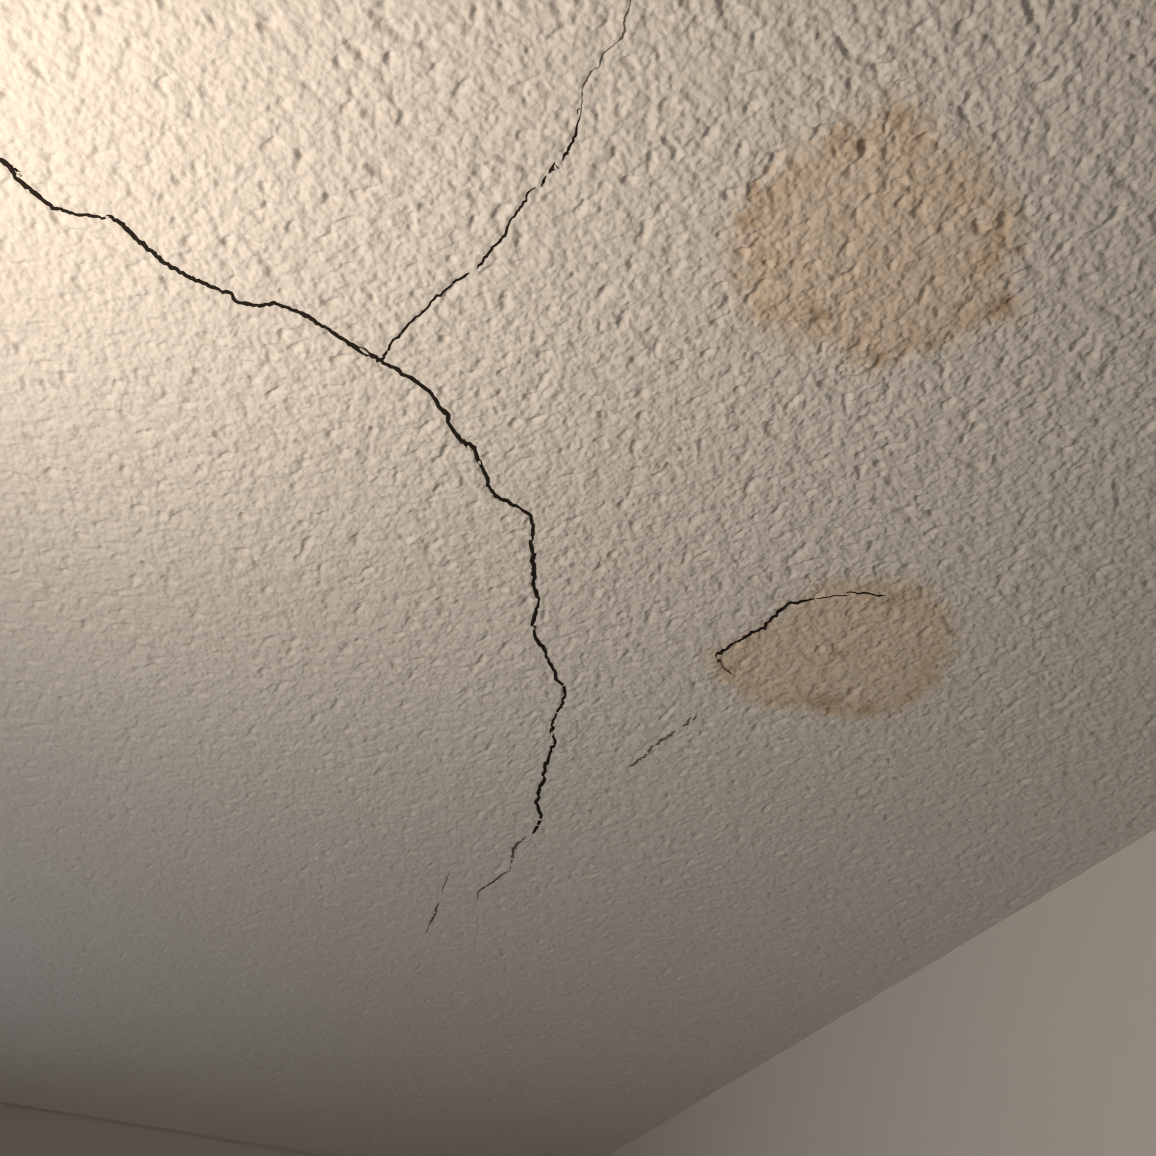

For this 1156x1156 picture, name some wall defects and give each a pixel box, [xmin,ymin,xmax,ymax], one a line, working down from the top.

water stain [702,79,1040,383]
crack [0,0,631,900]
crack [715,591,885,675]
water stain [692,564,970,727]
crack [628,714,698,767]
crack [425,874,449,935]